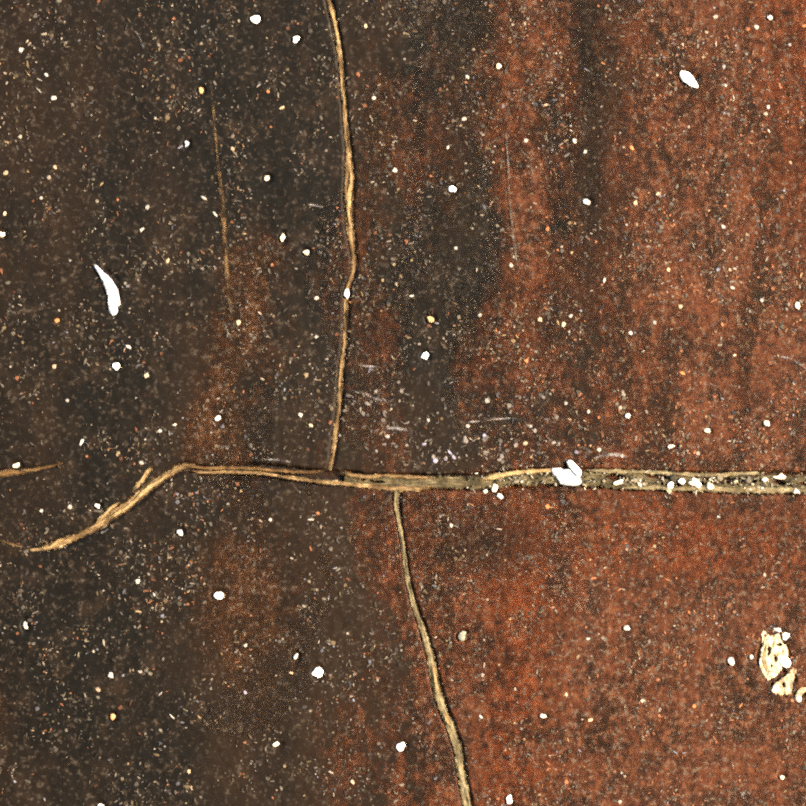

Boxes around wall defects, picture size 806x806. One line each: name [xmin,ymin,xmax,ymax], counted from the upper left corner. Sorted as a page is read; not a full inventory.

crack [0,0,563,806]
crack [576,468,806,494]